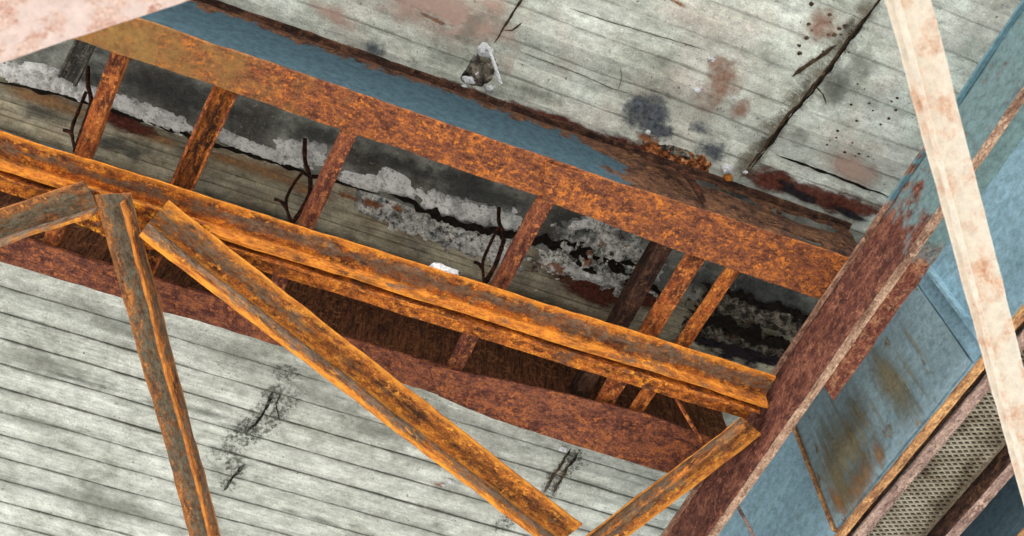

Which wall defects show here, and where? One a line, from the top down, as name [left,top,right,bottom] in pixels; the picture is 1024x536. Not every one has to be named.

corrosion [107,112,173,144]
spalling [460,42,499,92]
corrosion [510,101,712,173]
water stain [623,95,672,137]
water stain [690,124,748,182]
corrosion [692,56,750,116]
crack [737,0,888,197]
corrosion [745,167,881,217]
spalling [354,189,512,270]
spalling [517,217,644,298]
corrosion [547,272,618,308]
spalling [698,291,809,358]